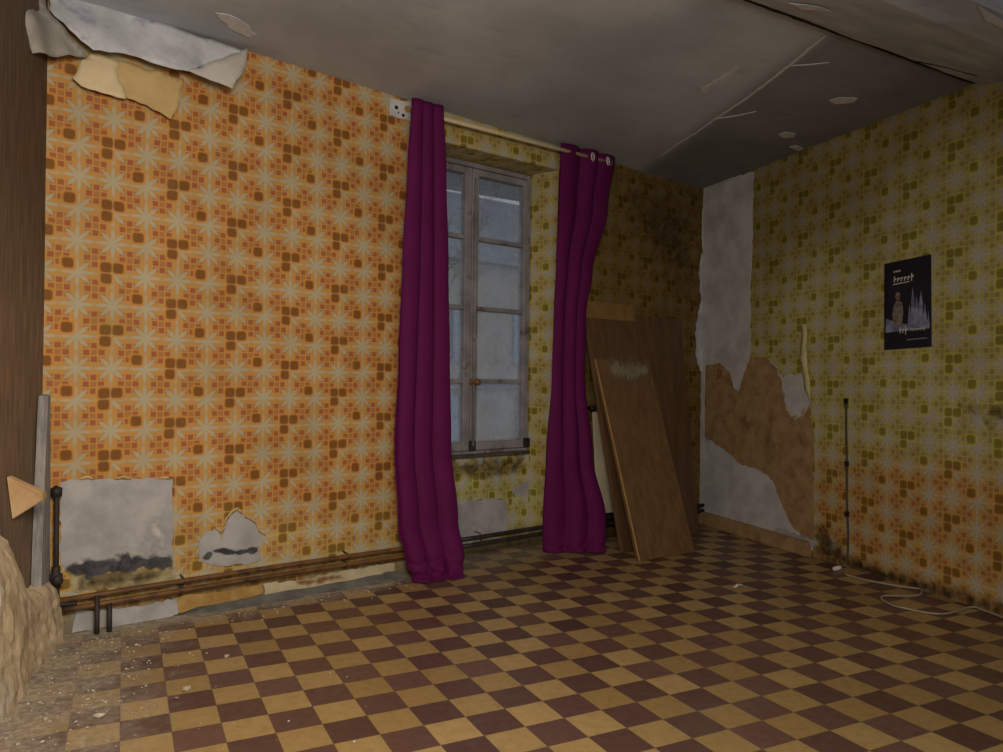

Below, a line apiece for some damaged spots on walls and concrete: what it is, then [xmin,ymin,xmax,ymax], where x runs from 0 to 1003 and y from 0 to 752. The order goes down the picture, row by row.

peeling [216,13,257,37]
peeling [117,60,184,119]
peeling [695,172,815,550]
flaking render [59,475,174,567]
flaking render [198,507,266,566]
damp [66,554,175,593]